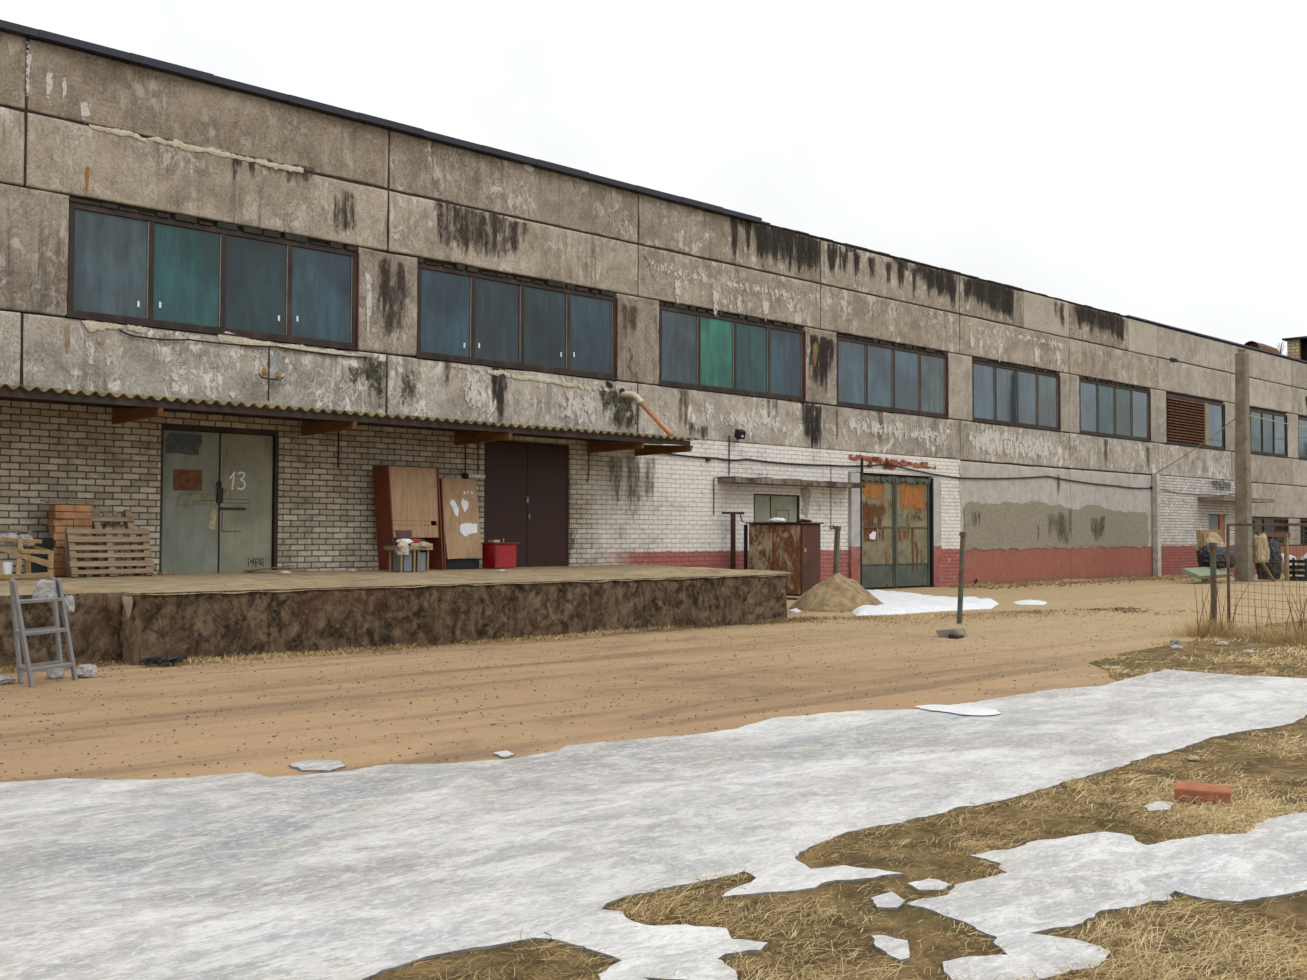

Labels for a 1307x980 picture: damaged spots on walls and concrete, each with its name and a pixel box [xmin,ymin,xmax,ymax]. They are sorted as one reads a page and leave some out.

water stain [334,191,356,229]
water stain [435,197,527,255]
water stain [730,217,1014,320]
water stain [365,258,406,336]
water stain [1055,301,1124,340]
water stain [809,334,834,391]
water stain [600,386,640,430]
water stain [802,402,839,447]
water stain [609,456,654,500]
corrosion [899,483,925,511]
corrosion [862,482,918,575]